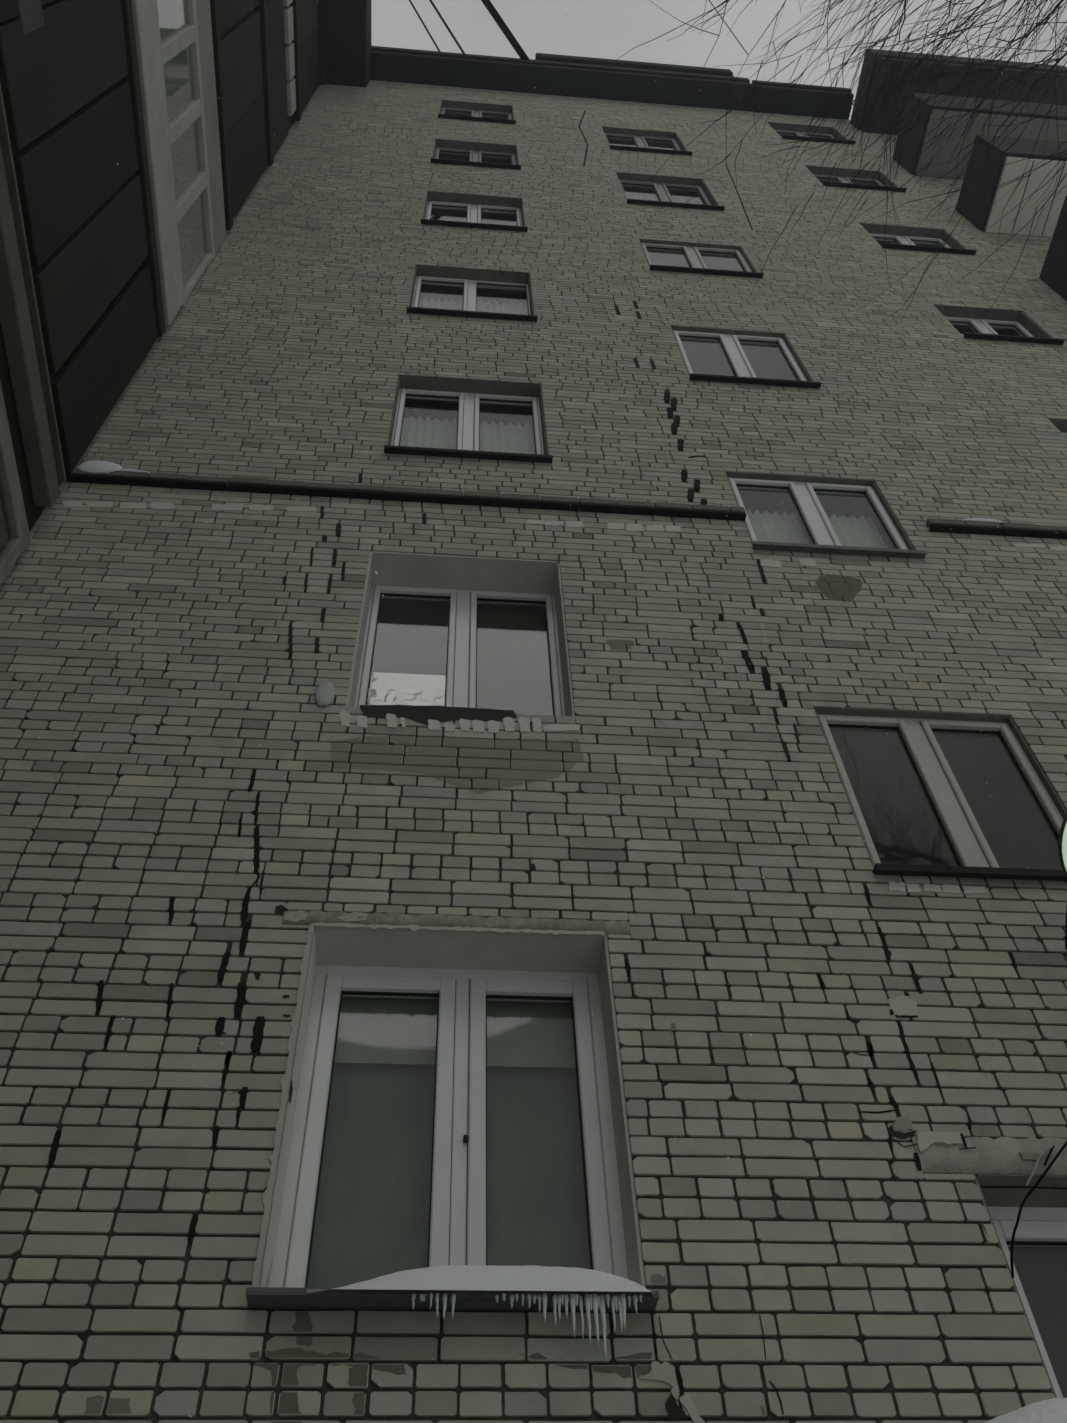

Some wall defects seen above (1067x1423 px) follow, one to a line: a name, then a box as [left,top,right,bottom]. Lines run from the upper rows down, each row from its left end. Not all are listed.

crack [663,392,707,505]
crack [719,613,787,704]
crack [167,897,175,919]
crack [212,770,265,1145]
crack [96,980,115,1045]
crack [166,983,174,1012]
crack [48,1130,61,1165]